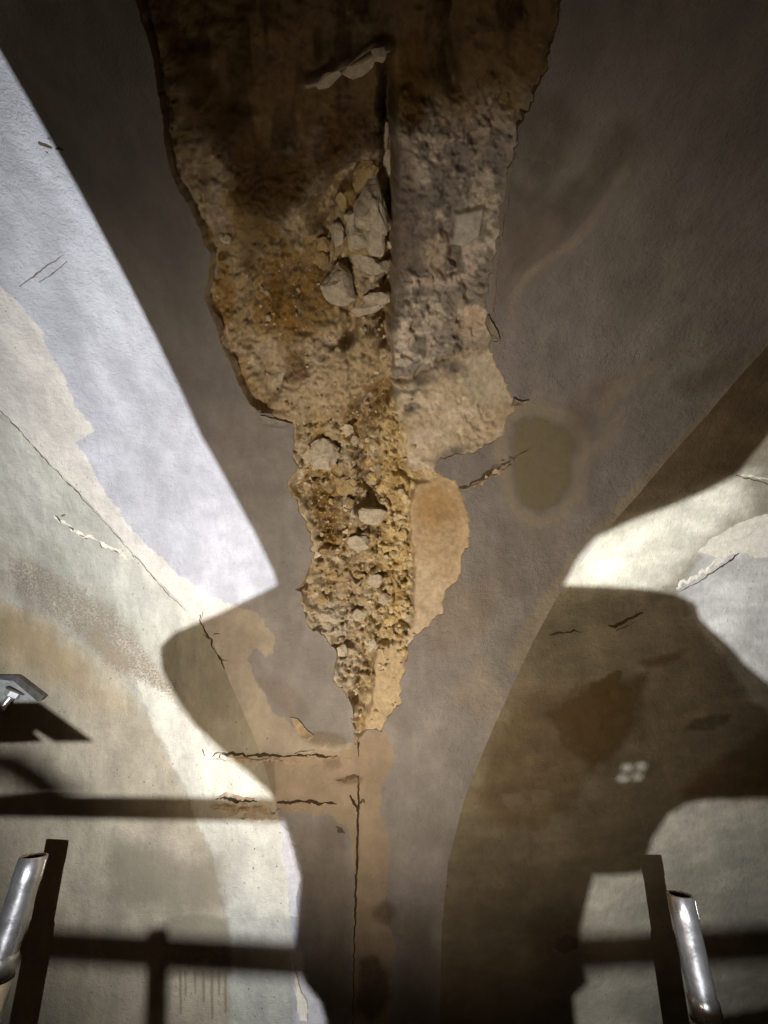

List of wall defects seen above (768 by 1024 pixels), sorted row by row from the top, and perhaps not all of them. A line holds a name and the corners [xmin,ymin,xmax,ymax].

crack [1,411,228,669]
spalling [135,0,562,745]
crack [459,447,531,490]
crack [676,549,740,592]
crack [202,742,365,1024]